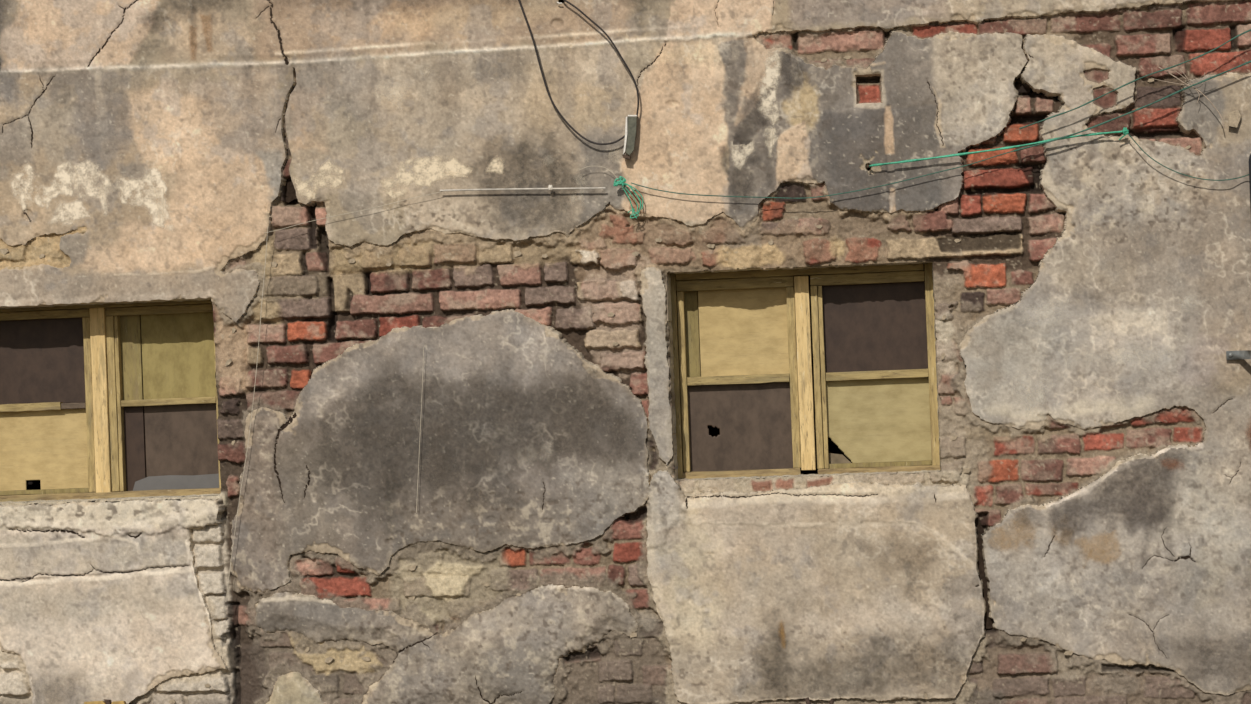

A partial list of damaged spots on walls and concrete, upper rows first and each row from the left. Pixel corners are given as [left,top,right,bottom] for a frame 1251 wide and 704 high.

crack [87,0,138,67]
crack [256,0,289,65]
leakage [732,51,799,194]
efflorescence [11,161,173,230]
crack [285,178,297,203]
flaking render [0,227,87,270]
flaking render [580,0,1251,537]
flaking render [129,67,688,704]
crack [274,412,310,503]
crack [975,519,994,629]
flaking render [0,647,33,704]
flaking render [730,579,1251,704]